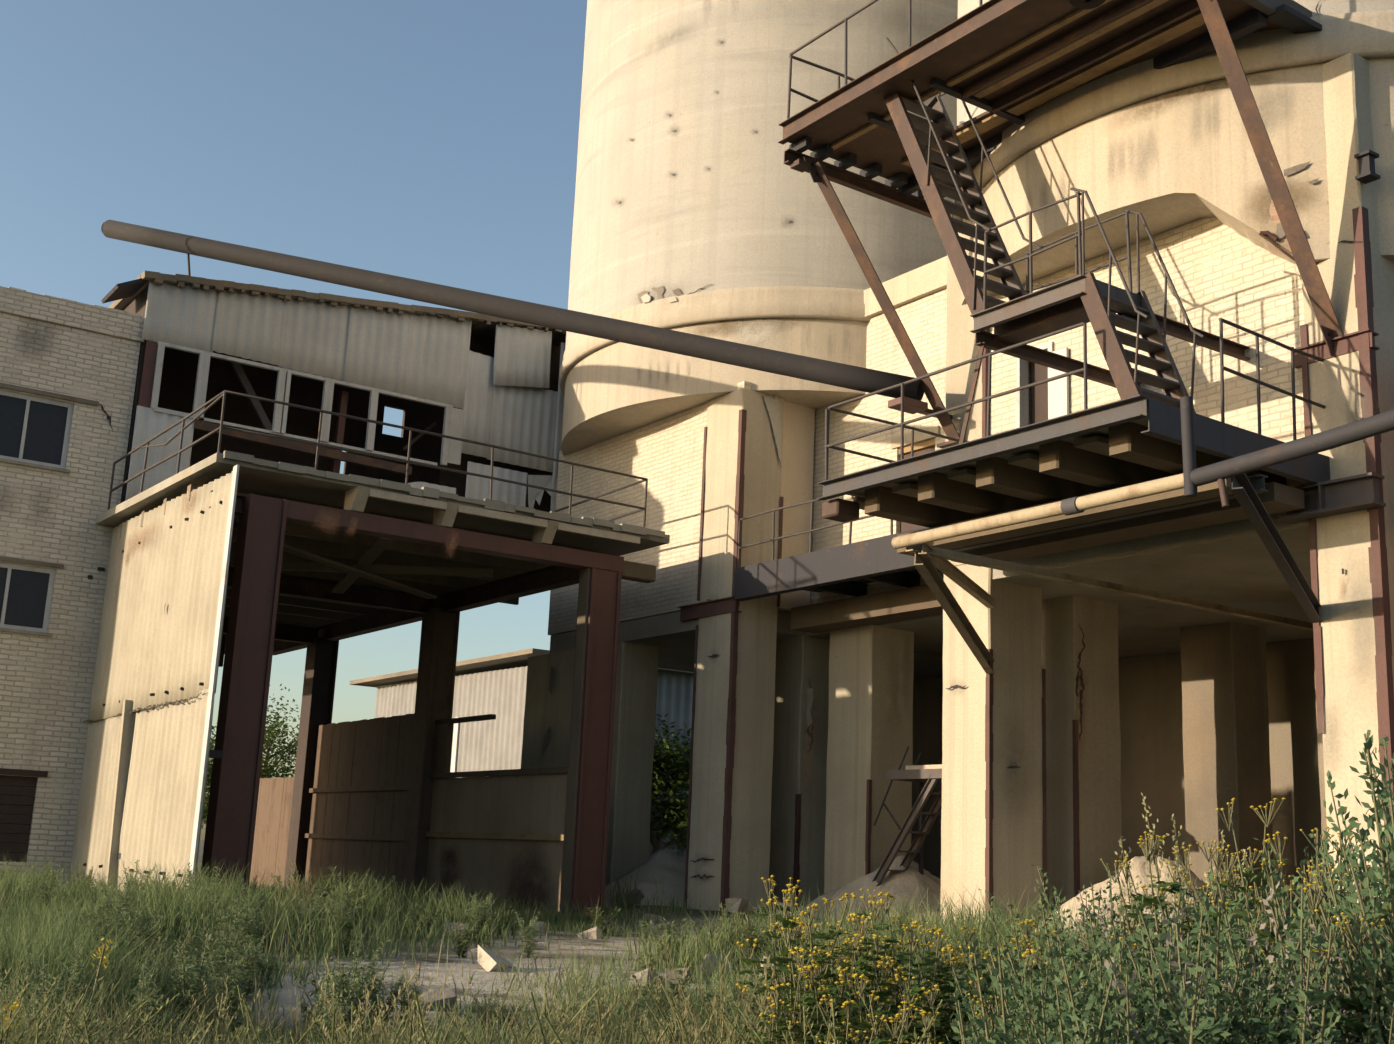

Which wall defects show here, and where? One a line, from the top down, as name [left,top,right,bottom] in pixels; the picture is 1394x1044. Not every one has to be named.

spalling [1284,161,1319,206]
spalling [1254,189,1295,261]
crack [1075,625,1085,740]